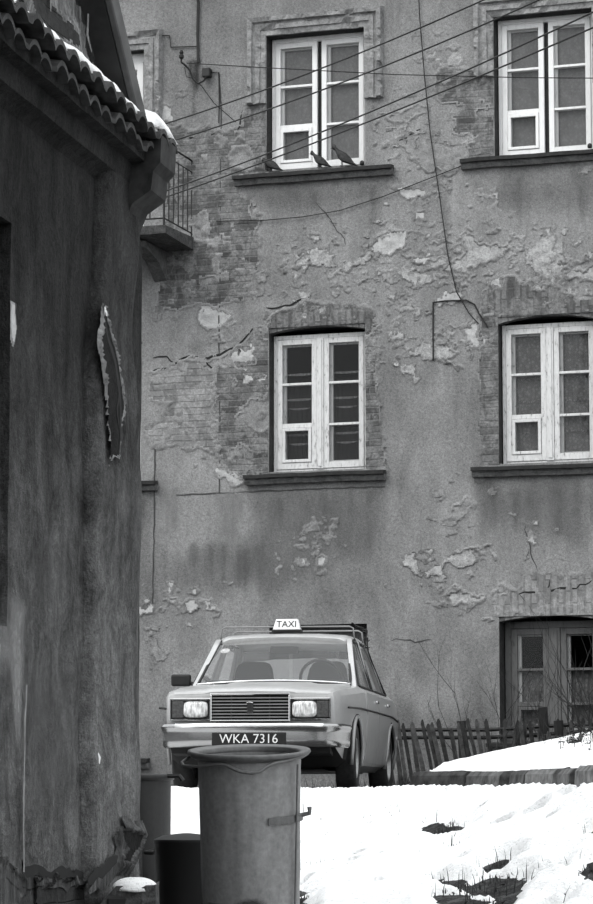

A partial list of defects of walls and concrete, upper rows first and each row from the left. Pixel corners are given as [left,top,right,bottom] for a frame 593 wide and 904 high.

flaking render [16,0,94,65]
crack [266,295,311,309]
flaking render [142,45,593,502]
crack [150,328,253,375]
flaking render [97,303,127,466]
flaking render [274,502,347,583]
flaking render [139,578,224,639]
flaking render [402,543,593,623]
flaking render [114,816,148,877]
flaking render [34,866,87,904]